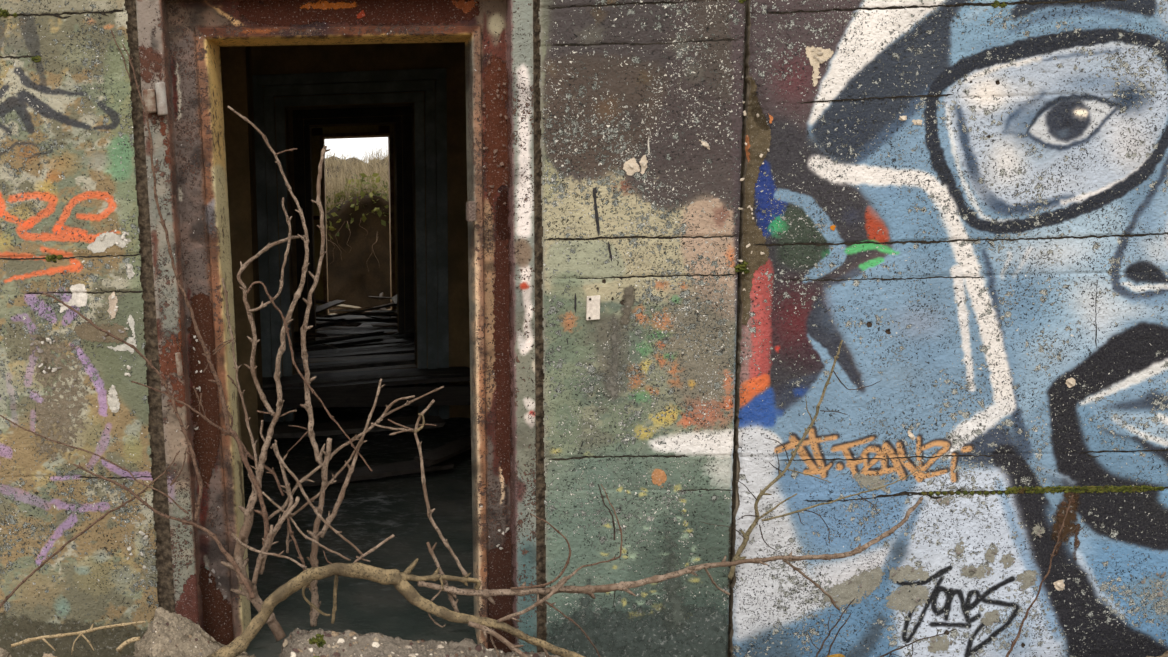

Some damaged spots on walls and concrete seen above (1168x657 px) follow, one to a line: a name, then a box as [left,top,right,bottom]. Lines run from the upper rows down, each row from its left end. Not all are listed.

corrosion [237,0,480,27]
corrosion [139,44,172,180]
corrosion [482,55,514,484]
corrosion [158,292,220,489]
corrosion [175,564,234,645]
corrosion [488,527,516,653]